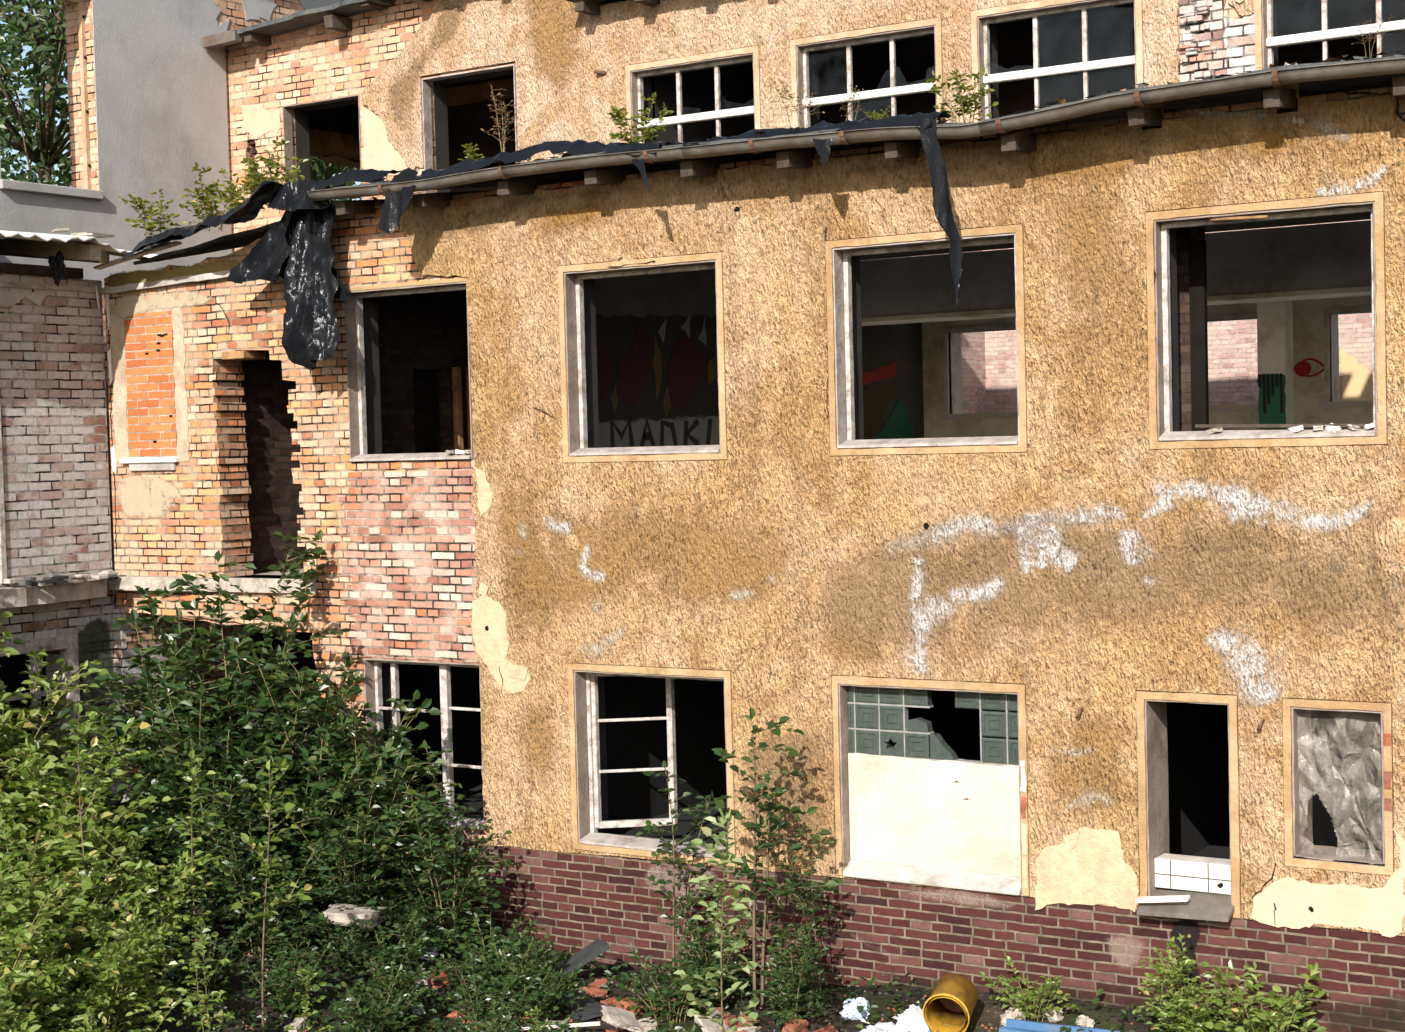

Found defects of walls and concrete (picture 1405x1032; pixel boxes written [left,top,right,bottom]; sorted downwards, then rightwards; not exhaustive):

spalling [1179,0,1217,83]
peeling [362,107,424,176]
peeling [472,581,530,694]
peeling [1020,761,1139,912]
peeling [1250,829,1405,937]